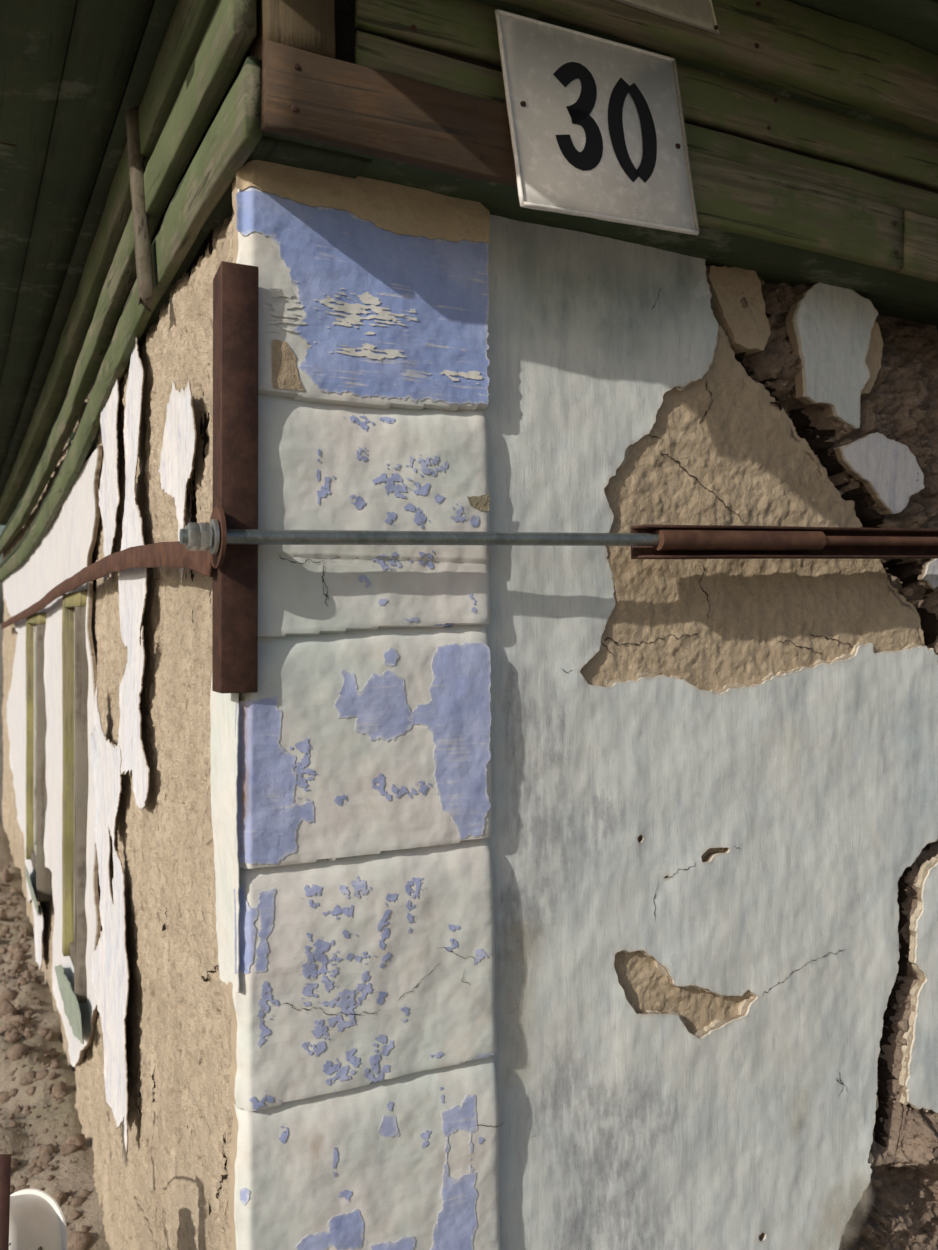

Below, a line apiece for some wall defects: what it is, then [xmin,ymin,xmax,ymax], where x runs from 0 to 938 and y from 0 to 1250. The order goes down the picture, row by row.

peeling [92,160,490,564]
crack [276,552,332,606]
spalling [580,265,926,691]
crack [718,277,938,529]
crack [872,559,938,655]
flaking render [918,559,938,589]
peeling [335,642,491,839]
flaking render [2,567,318,1250]
crack [281,947,475,1016]
spalling [614,951,753,1033]
crack [761,950,842,997]
crack [870,839,938,1166]